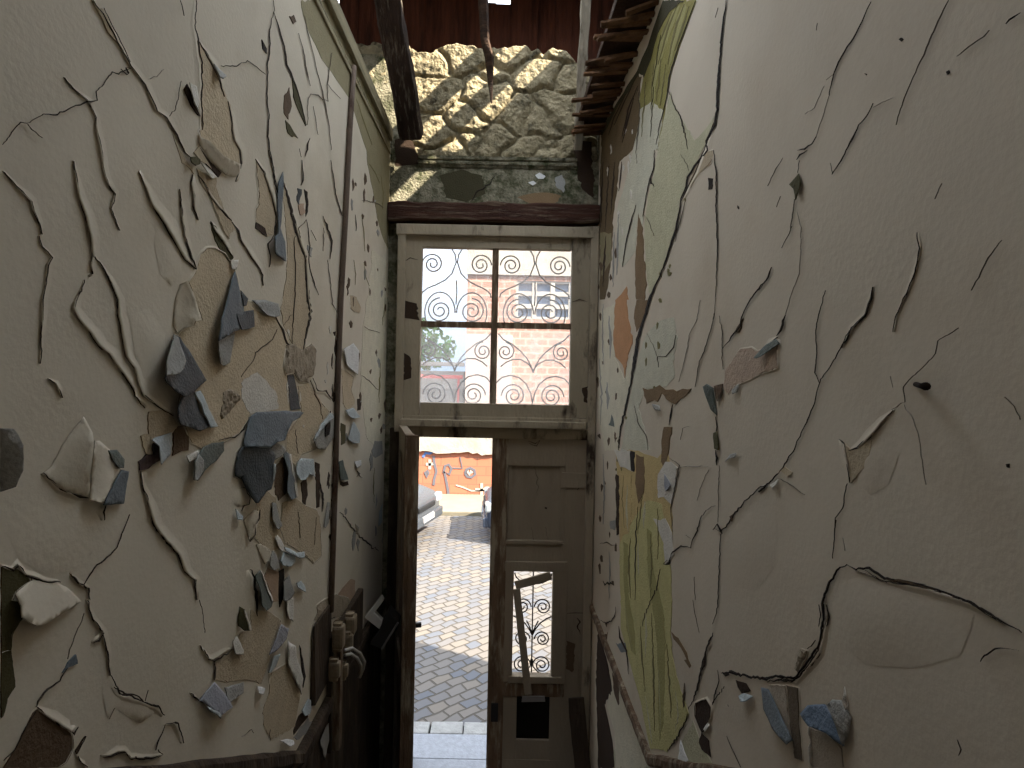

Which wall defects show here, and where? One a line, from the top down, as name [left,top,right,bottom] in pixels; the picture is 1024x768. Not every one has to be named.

crack [830,0,949,174]
crack [2,0,382,419]
crack [618,0,871,450]
crack [892,232,922,332]
peeling [0,428,24,492]
peeling [42,39,386,747]
peeling [703,338,780,415]
crack [567,286,1022,750]
crack [0,471,231,767]
peeling [596,622,650,768]
spalling [693,696,714,758]
peeling [736,680,846,768]